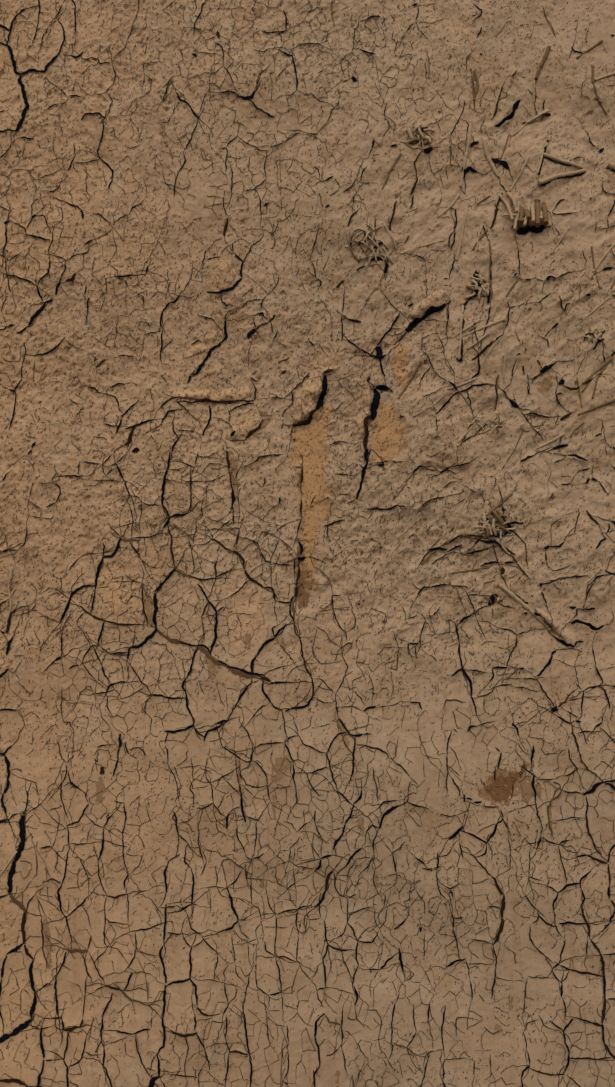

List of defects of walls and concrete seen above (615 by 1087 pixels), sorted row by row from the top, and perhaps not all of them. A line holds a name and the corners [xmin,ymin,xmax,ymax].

crack [0,0,157,429]
crack [295,1,615,537]
crack [0,369,615,1087]